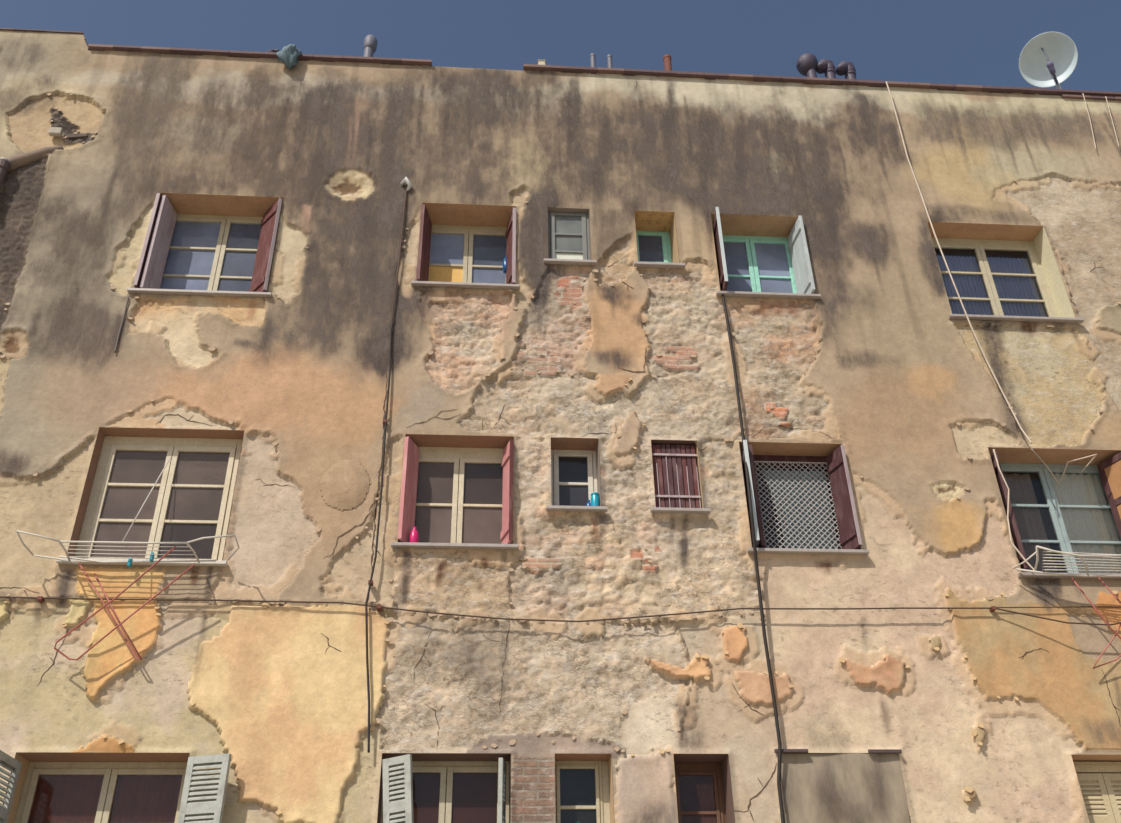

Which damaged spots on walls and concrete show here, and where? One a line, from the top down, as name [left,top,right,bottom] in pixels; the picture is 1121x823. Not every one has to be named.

spalling [0,93,106,412]
water stain [32,288,124,362]
water stain [221,79,427,373]
flaking render [325,170,374,201]
water stain [434,68,548,195]
water stain [520,80,886,314]
water stain [850,94,897,164]
water stain [921,106,1106,158]
crack [324,374,509,567]
peeling [0,176,1121,823]